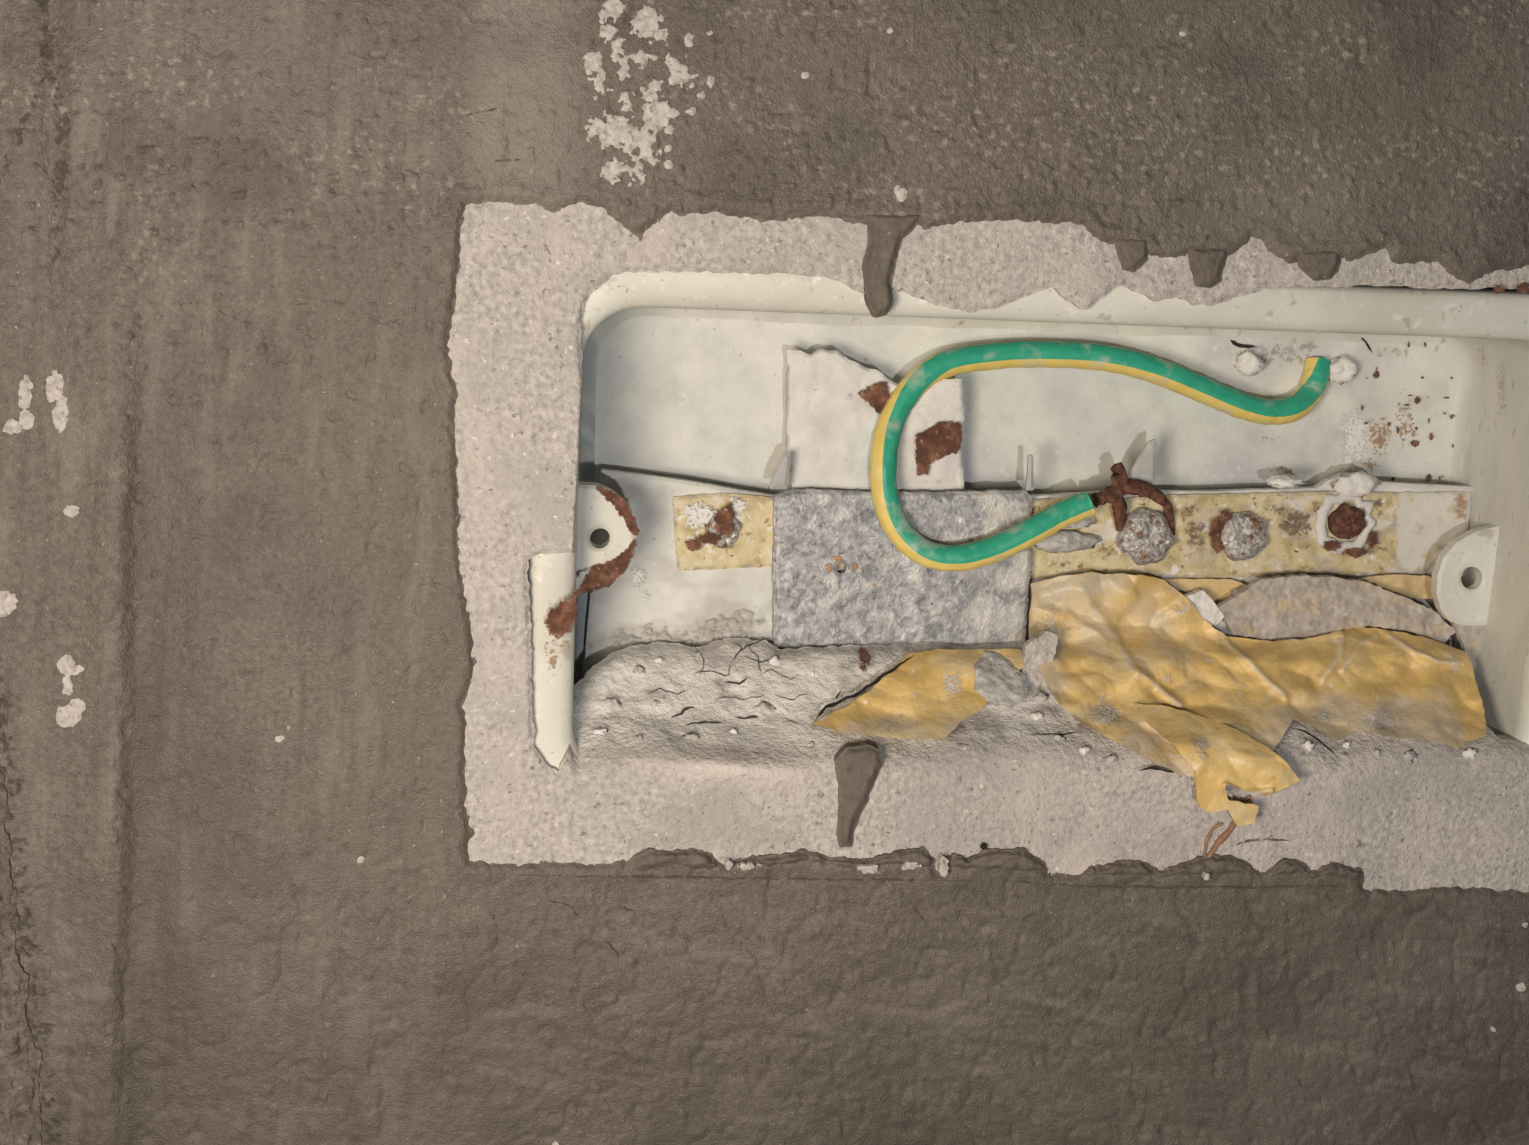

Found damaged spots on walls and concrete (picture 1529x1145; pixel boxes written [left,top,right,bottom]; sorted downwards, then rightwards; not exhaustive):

peeling [582,0,715,187]
corrosion [858,382,890,415]
corrosion [915,421,963,476]
corrosion [685,502,735,551]
peeling [447,202,1529,893]
corrosion [1181,506,1232,554]
corrosion [1264,499,1382,559]
corrosion [544,486,640,670]
crack [0,678,60,1144]